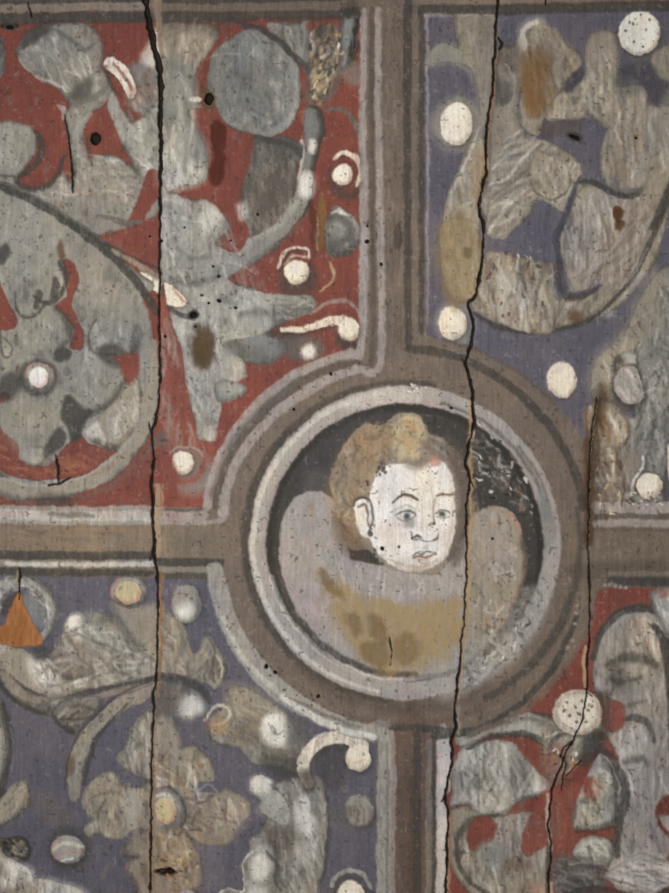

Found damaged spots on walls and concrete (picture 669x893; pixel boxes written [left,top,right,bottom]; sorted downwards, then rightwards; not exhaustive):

crack [142,0,166,893]
crack [444,0,504,893]
crack [546,397,598,893]